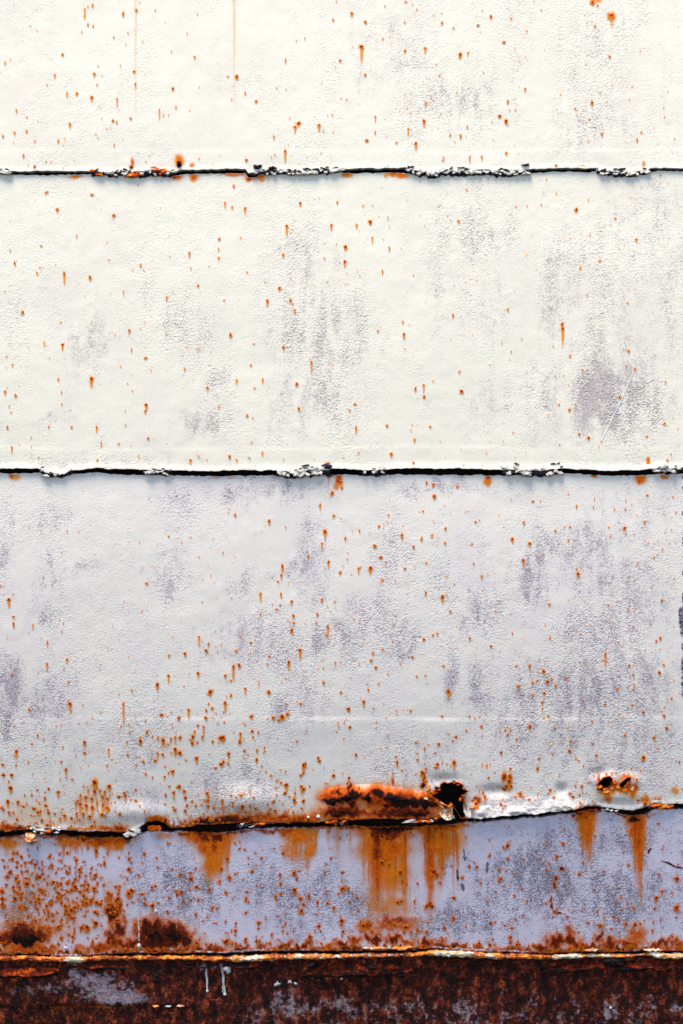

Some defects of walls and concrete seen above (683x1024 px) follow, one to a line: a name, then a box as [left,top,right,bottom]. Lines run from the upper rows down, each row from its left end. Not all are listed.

spalling [91,168,177,178]
rust [171,155,213,181]
spalling [252,166,346,179]
spalling [405,165,531,179]
spalling [596,168,651,178]
spalling [39,466,73,479]
spalling [276,464,333,479]
spalling [361,465,386,477]
spalling [501,462,563,477]
rust [253,563,340,645]
rust [0,615,683,956]
spalling [402,783,475,826]